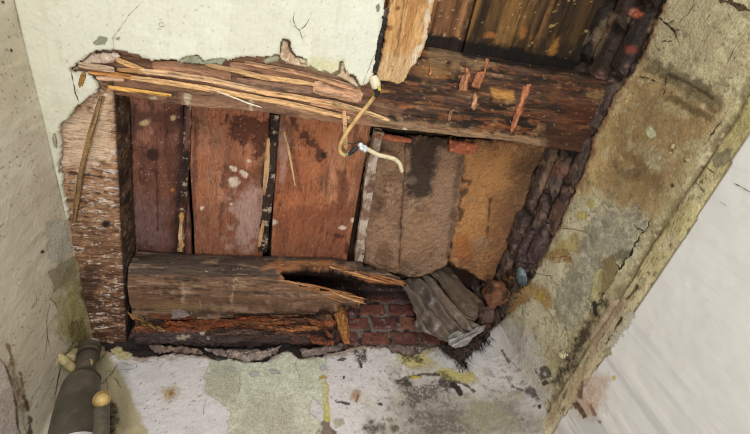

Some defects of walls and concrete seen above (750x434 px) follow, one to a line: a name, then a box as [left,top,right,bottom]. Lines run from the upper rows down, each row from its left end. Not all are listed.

flaking render [73,36,122,70]
peeling [180,56,226,65]
flaking render [263,40,308,68]
flaking render [336,62,359,88]
damp [647,58,722,120]
crack [657,0,750,70]
peeling [49,256,77,292]
crack [599,220,651,301]
peeling [100,280,448,434]